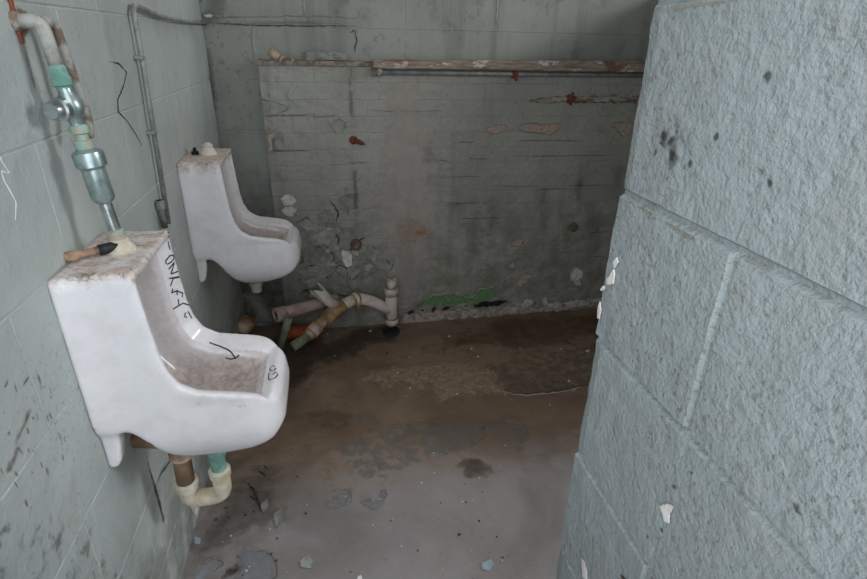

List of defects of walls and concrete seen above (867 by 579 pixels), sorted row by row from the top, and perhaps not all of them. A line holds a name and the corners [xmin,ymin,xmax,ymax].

peeling [297,193,394,298]
spalling [569,267,583,286]
spalling [600,257,619,291]
peeling [408,287,506,315]
peeling [659,504,674,523]
peeling [239,548,278,579]